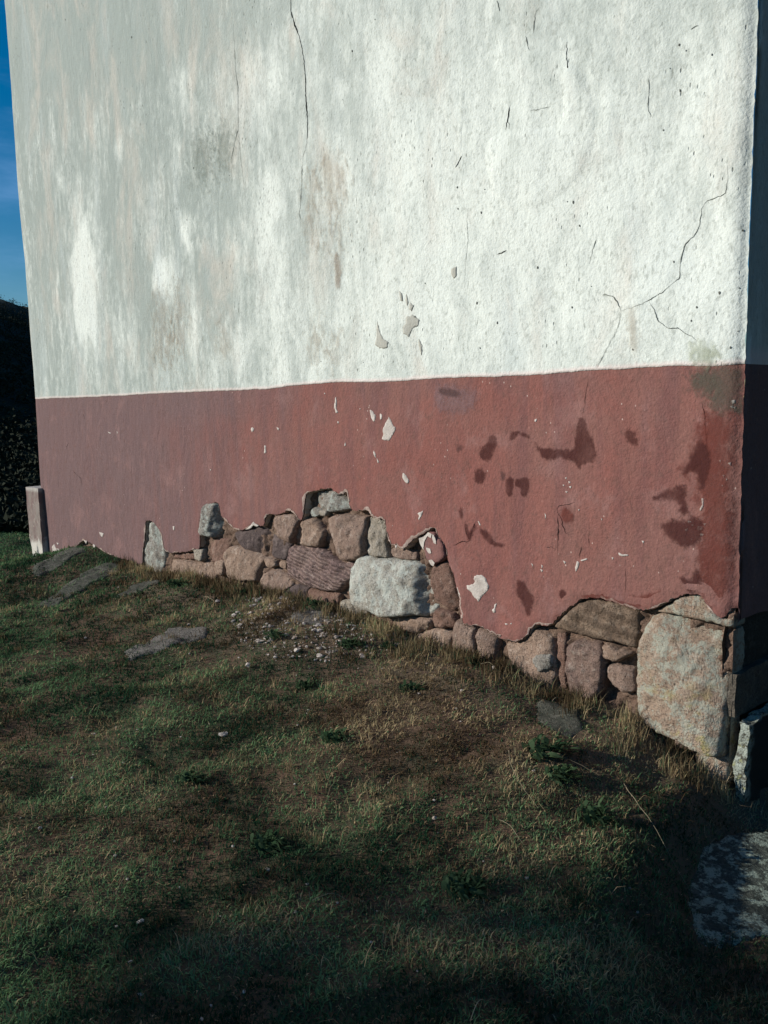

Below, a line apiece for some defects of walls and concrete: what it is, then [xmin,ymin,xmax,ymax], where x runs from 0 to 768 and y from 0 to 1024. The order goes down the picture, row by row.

crack [582,172,728,414]
peeling [375,321,389,349]
peeling [399,291,422,355]
peeling [359,408,396,441]
water stain [475,441,496,483]
water stain [506,477,529,496]
water stain [537,419,595,468]
water stain [653,413,732,598]
spalling [76,488,689,666]
water stain [517,581,533,615]
spalling [682,601,738,675]
spalling [598,681,639,714]